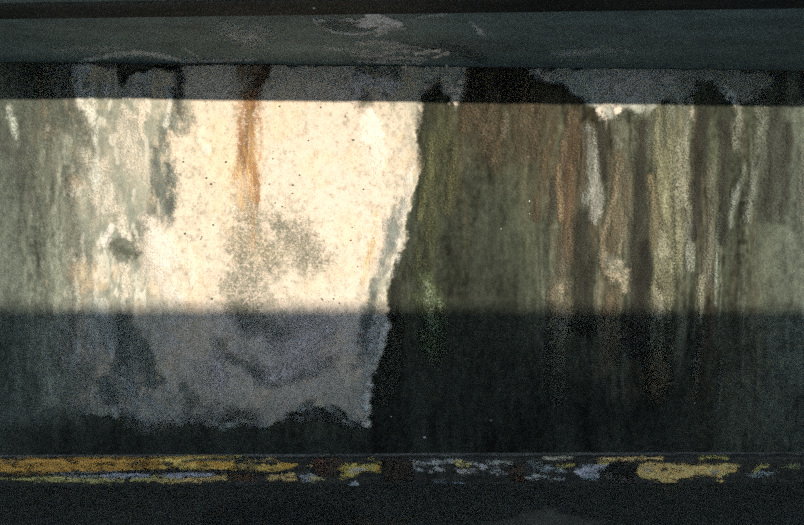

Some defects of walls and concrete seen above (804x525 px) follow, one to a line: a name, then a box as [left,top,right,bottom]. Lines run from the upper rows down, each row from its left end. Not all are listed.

damp [1,63,211,309]
rust [233,65,264,247]
damp [194,195,340,395]
damp [352,196,415,406]
damp [313,18,486,174]
damp [417,81,441,205]
damp [543,70,804,405]
peeling [0,455,325,484]
peeling [335,456,382,480]
peeling [413,458,513,484]
peeling [524,455,740,483]
peeling [748,463,798,478]